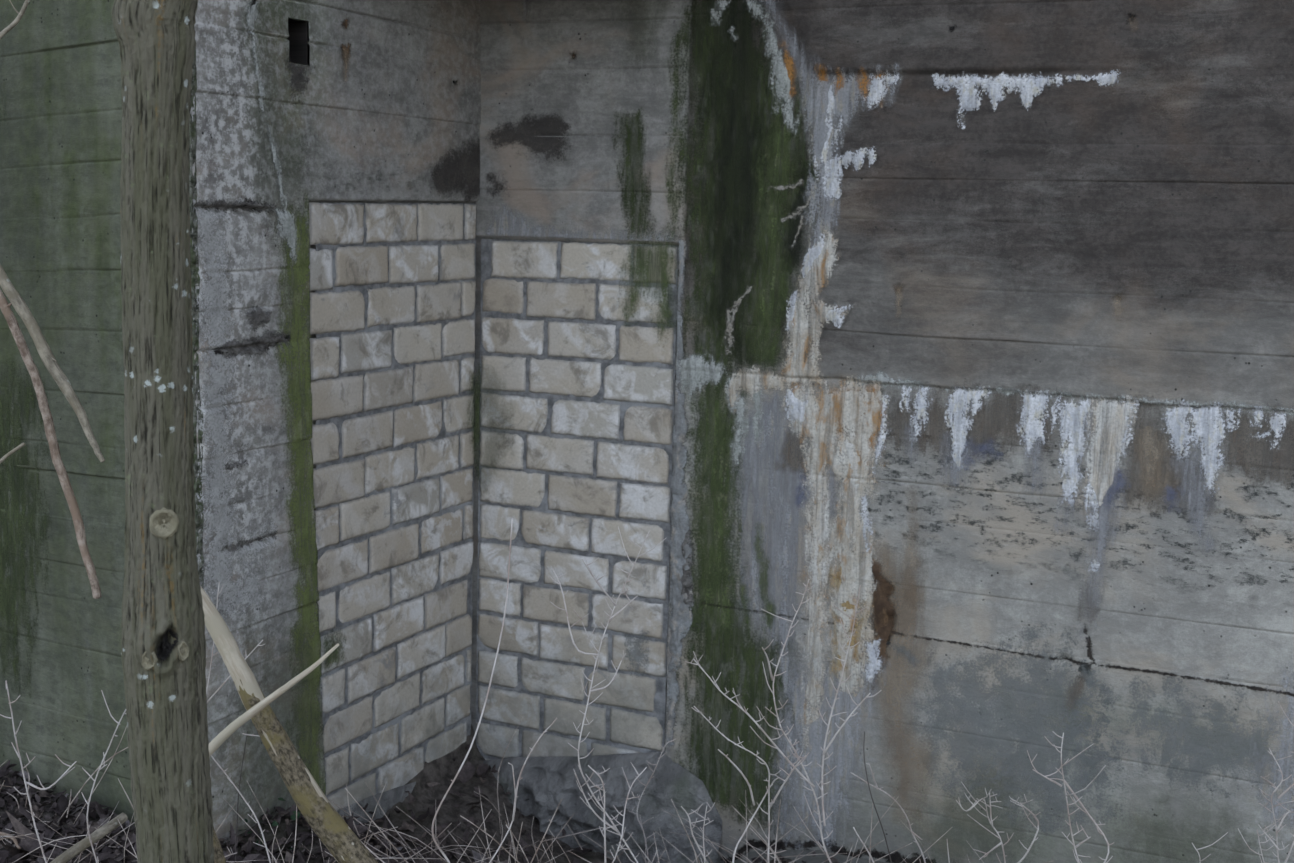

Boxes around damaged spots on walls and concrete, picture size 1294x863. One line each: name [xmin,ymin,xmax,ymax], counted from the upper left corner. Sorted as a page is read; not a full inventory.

leakage [432,113,674,245]
leakage [677,0,1294,848]